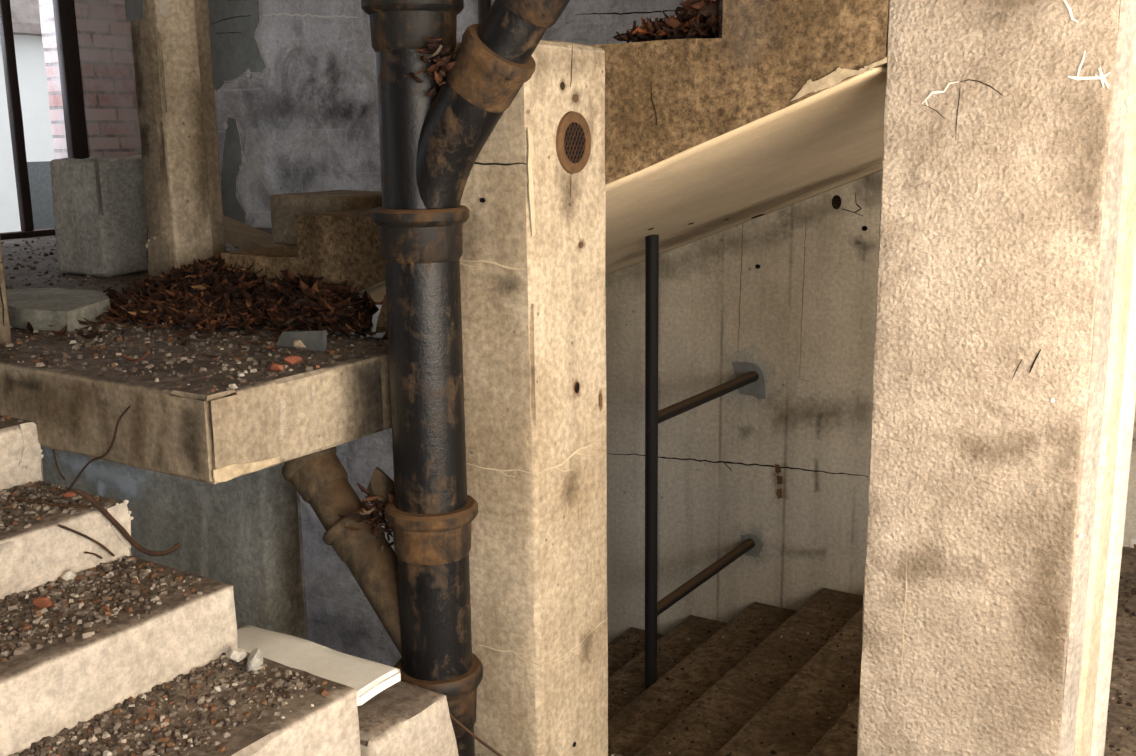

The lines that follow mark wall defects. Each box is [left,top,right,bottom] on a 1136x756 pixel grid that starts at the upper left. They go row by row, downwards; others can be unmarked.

flaking render [208,0,271,96]
crack [925,79,1003,140]
crack [608,453,868,477]